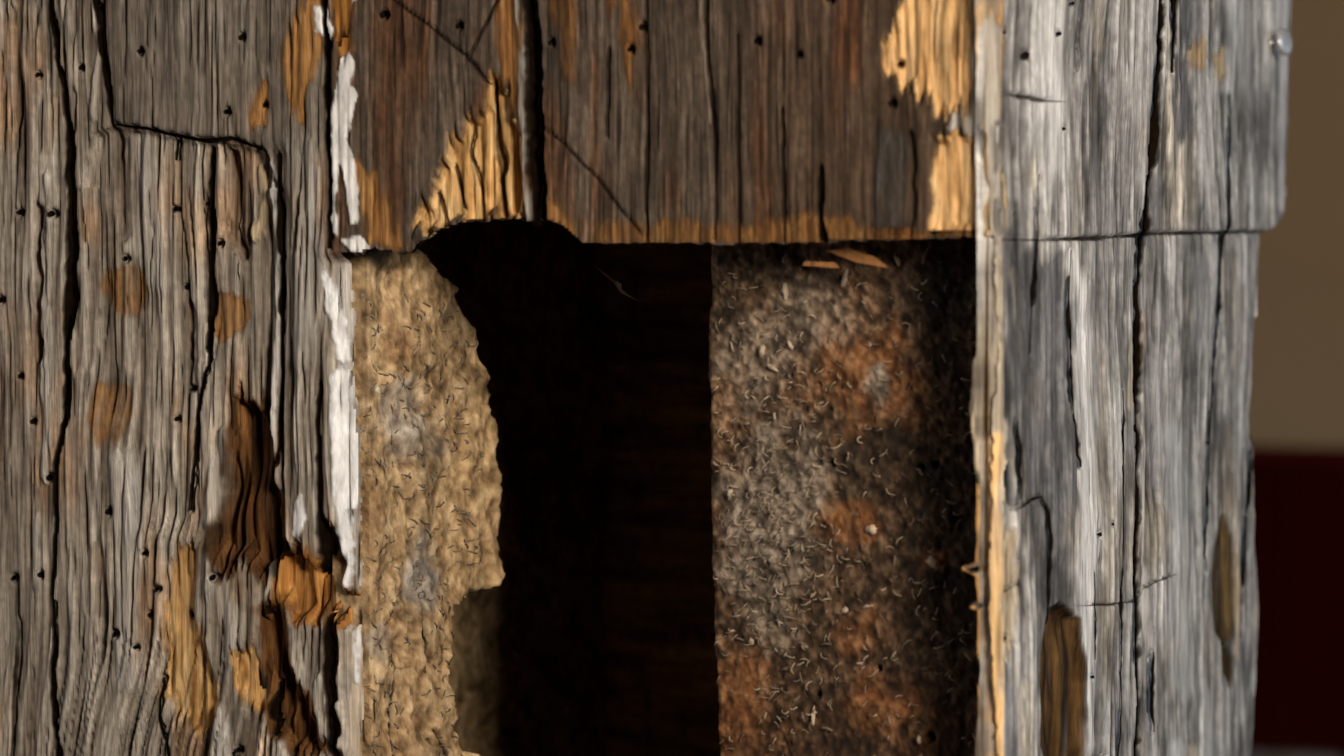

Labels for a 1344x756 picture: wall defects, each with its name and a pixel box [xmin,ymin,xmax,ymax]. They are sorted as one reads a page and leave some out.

crack [11,0,78,756]
crack [92,0,287,511]
peeling [292,494,307,543]
crack [321,0,333,248]
peeling [314,6,369,252]
peeling [322,271,363,683]
crack [438,0,649,234]
peeling [928,129,989,234]
peeling [970,387,980,473]
crack [1094,0,1179,756]
peeling [230,602,329,756]
crack [323,612,431,756]